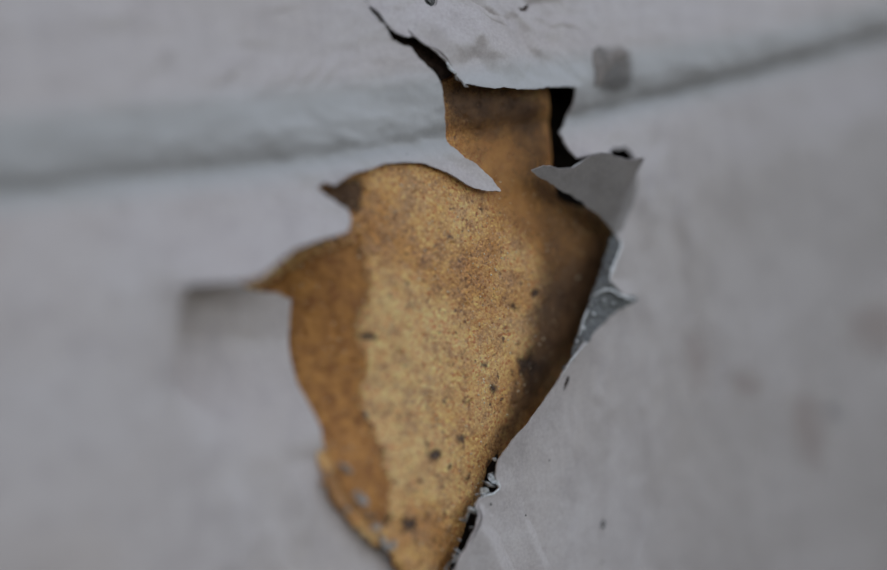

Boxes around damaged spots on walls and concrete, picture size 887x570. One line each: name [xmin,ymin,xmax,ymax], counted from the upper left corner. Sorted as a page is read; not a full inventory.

peeling [173,62,644,570]